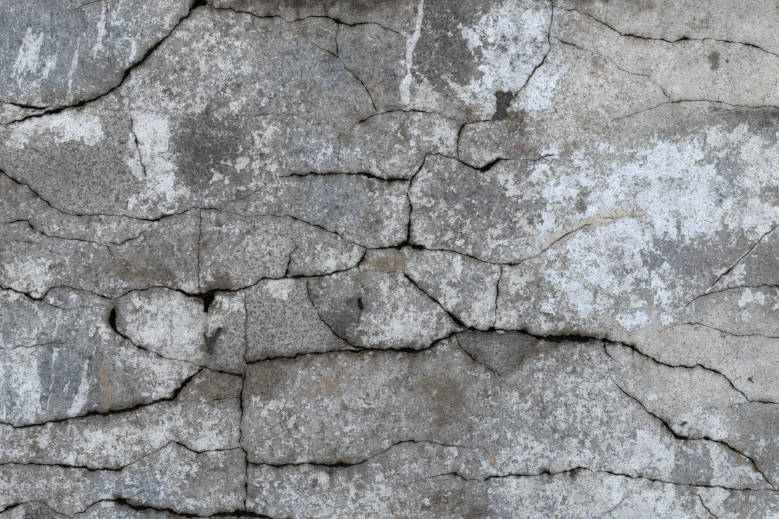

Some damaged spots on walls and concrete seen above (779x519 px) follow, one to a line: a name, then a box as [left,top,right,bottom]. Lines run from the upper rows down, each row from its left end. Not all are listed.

crack [0,0,198,125]
crack [207,2,456,131]
crack [513,0,779,122]
crack [130,108,168,176]
crack [0,120,779,519]